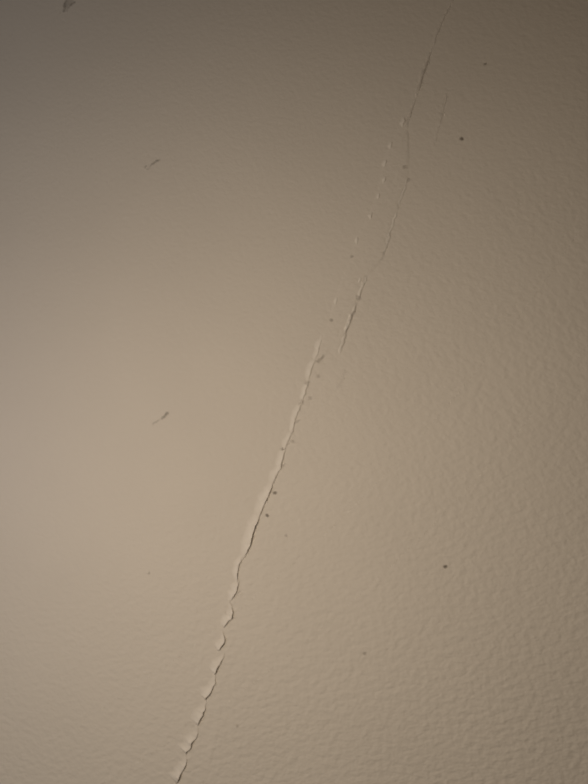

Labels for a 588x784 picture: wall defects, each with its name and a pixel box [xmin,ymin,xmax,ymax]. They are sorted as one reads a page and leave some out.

peeling [168,335,322,784]